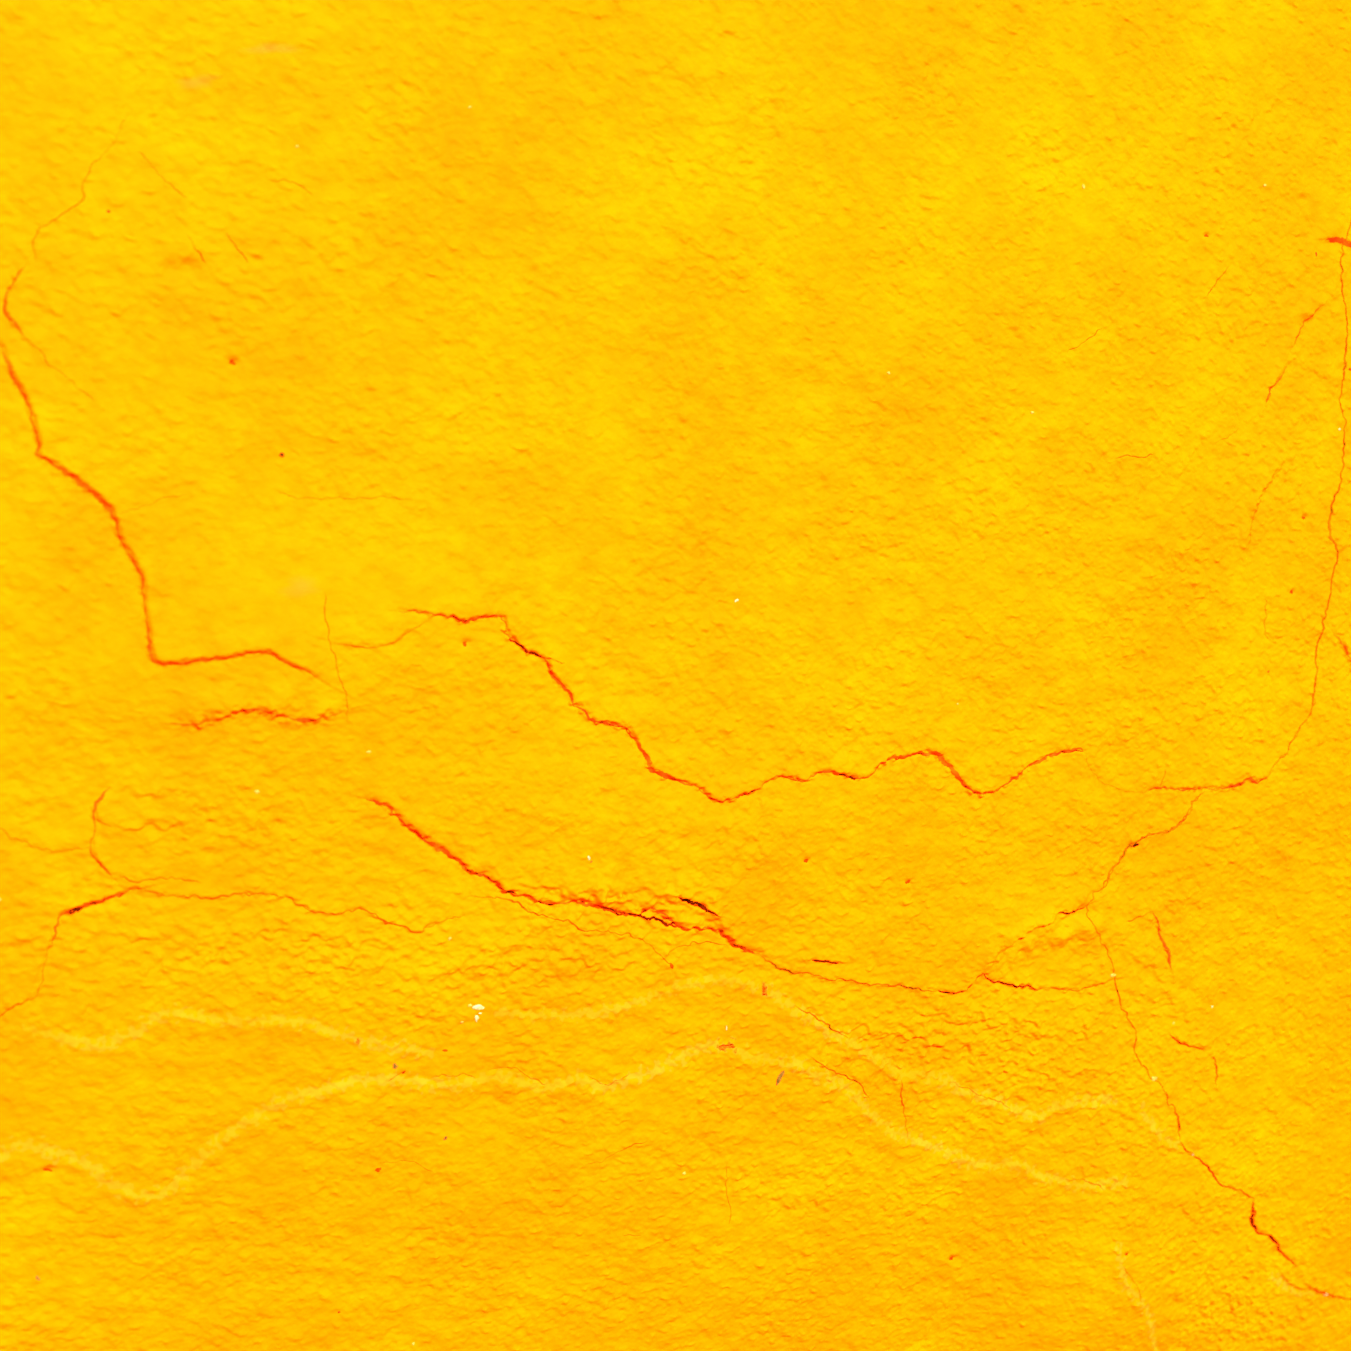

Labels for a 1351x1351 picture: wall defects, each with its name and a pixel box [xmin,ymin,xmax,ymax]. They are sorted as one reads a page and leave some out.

crack [2,113,1120,803]
crack [0,223,1351,1300]